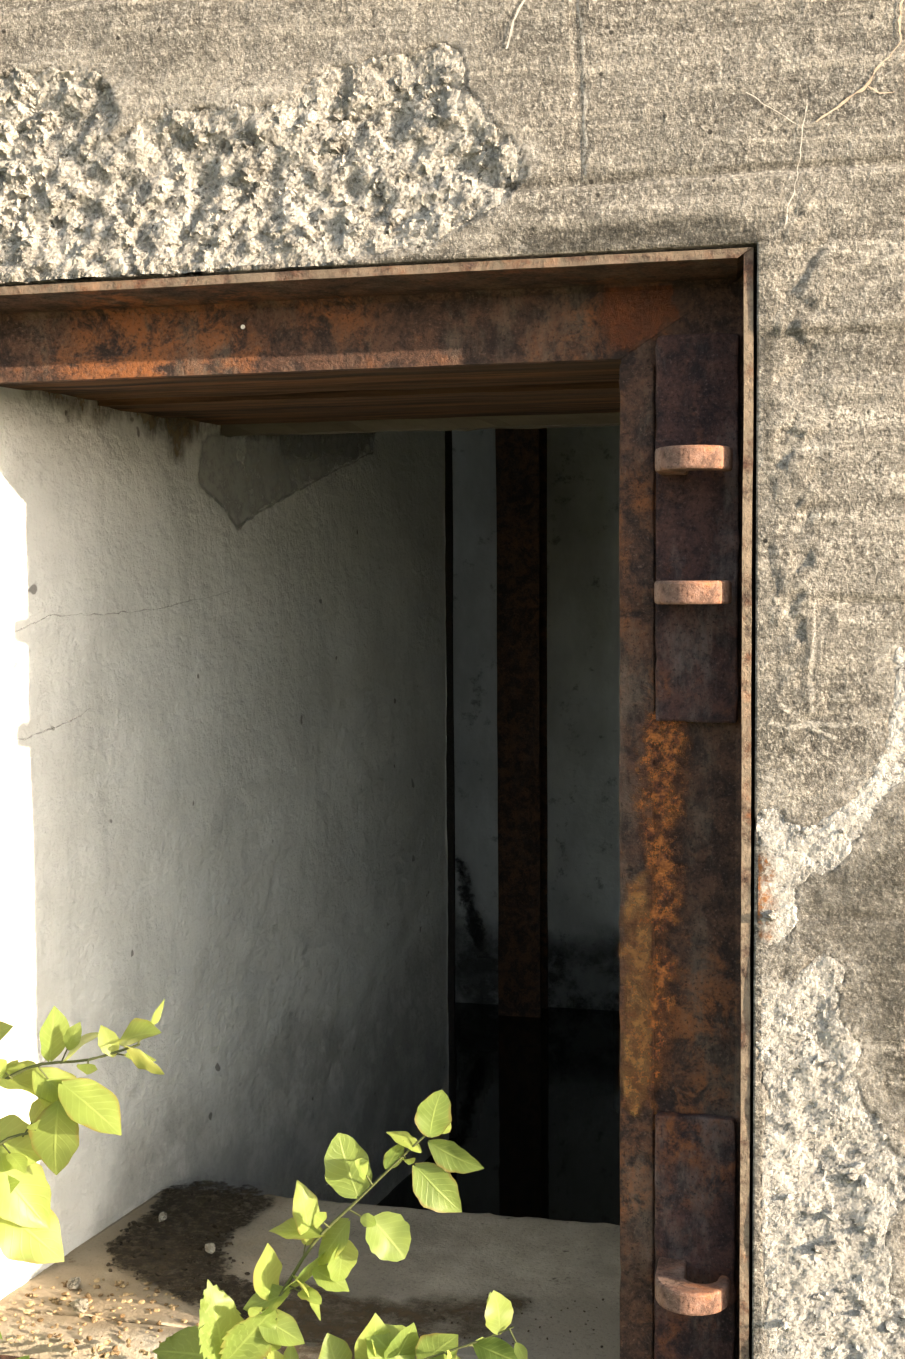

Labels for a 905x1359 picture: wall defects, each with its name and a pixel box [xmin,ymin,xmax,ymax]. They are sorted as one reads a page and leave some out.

spalling [0,43,538,283]
crack [506,0,525,49]
crack [745,0,904,229]
corrosion [620,713,687,1116]
corrosion [758,855,778,940]
peeling [757,645,905,945]
spalling [756,953,905,1359]